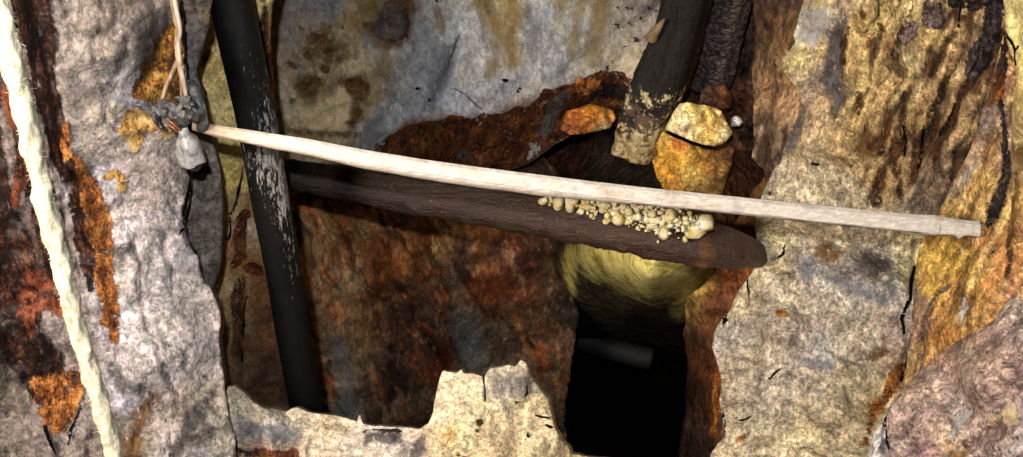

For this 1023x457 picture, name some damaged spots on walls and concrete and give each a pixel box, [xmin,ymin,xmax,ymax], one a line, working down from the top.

rust [14,0,120,344]
rust [374,70,632,169]
rust [0,72,84,436]
crack [899,265,951,382]
rust [860,362,906,446]